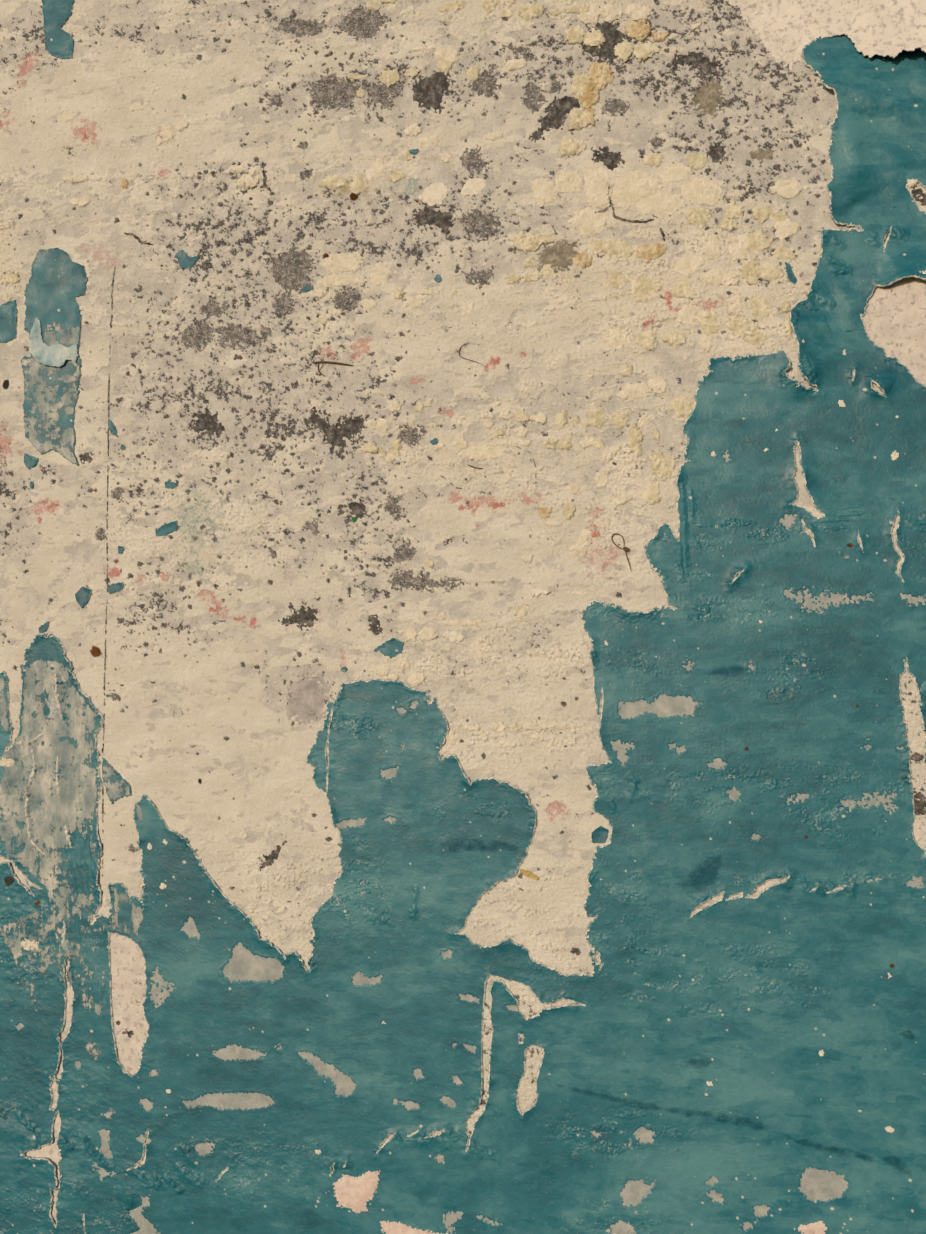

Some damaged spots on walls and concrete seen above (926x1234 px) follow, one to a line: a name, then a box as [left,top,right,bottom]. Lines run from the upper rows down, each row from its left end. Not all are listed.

peeling [0,0,926,975]
peeling [109,934,176,1075]
peeling [222,942,285,982]
peeling [459,993,480,1003]
peeling [516,1035,543,1113]